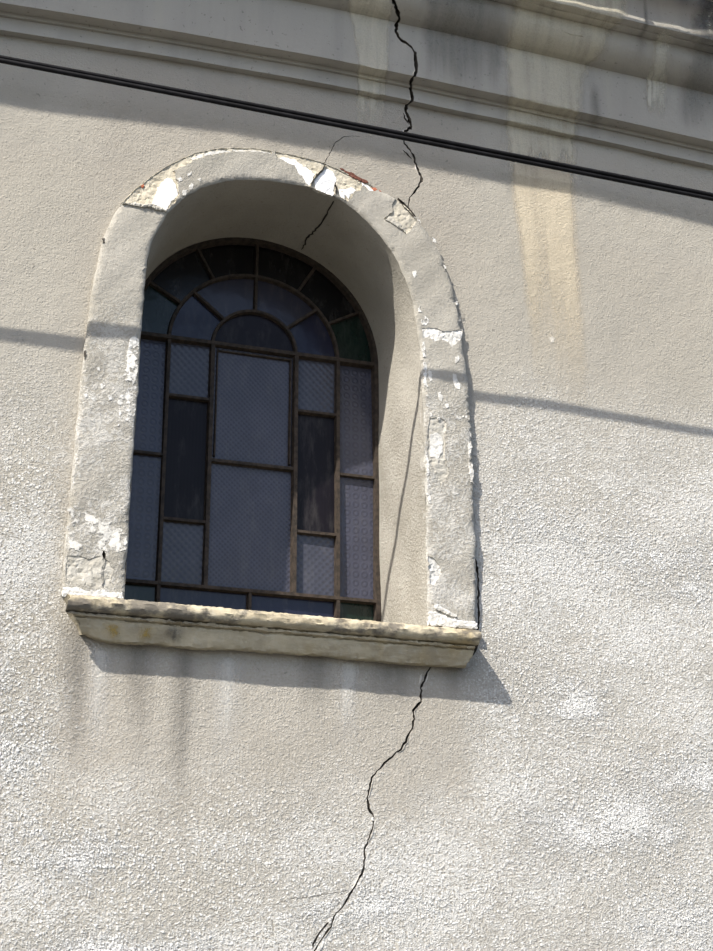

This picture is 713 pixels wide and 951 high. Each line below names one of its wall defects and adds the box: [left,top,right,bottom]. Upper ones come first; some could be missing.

crack [392,0,423,217]
spalling [121,148,381,212]
crack [301,136,360,250]
spalling [384,200,421,234]
leakage [507,0,624,326]
peeling [100,336,139,428]
peeling [418,306,474,504]
peeling [61,505,128,599]
peeling [428,555,441,585]
spalling [427,604,478,629]
crack [472,559,480,655]
crack [272,667,431,951]